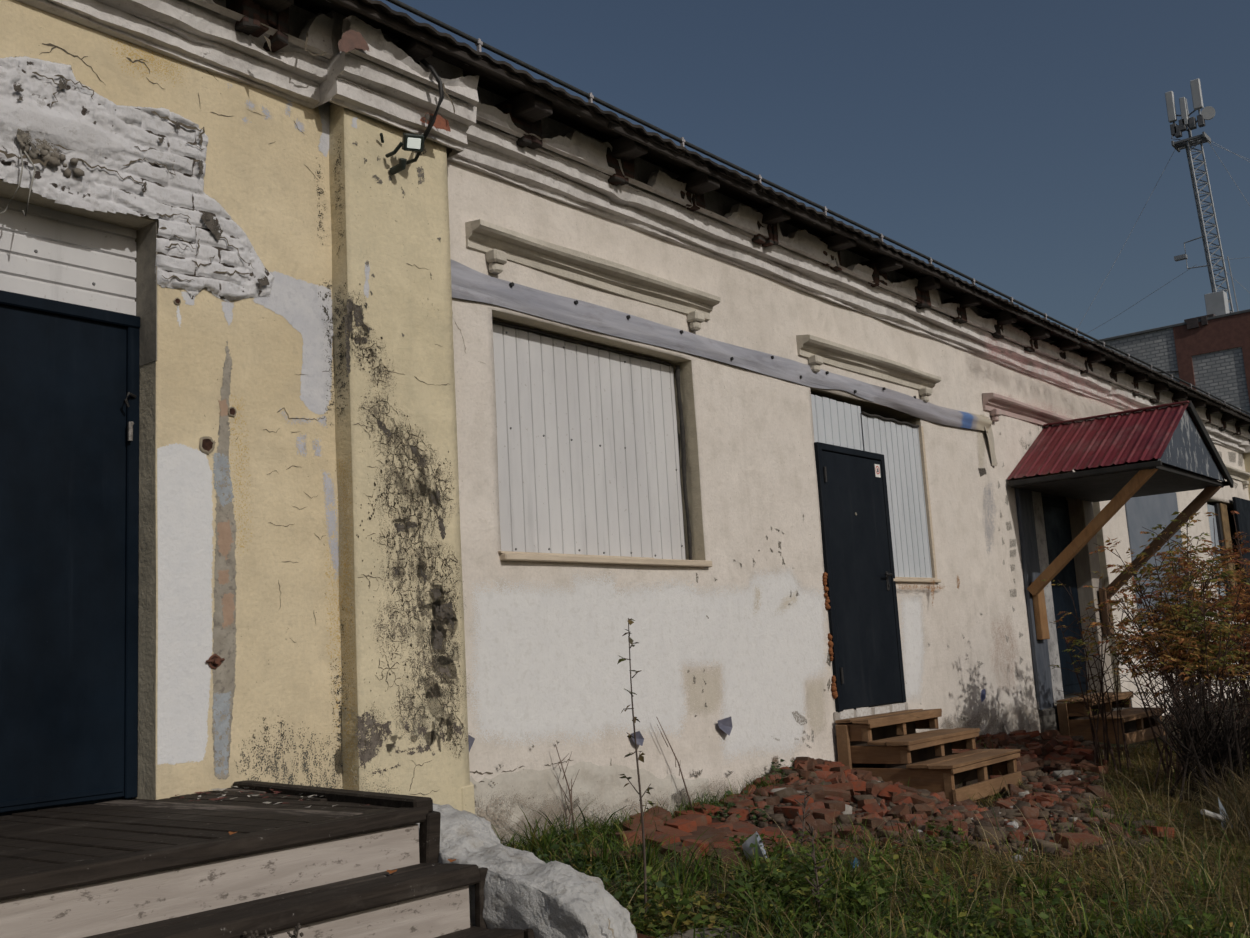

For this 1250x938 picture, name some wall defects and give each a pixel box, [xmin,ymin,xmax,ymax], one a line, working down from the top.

leakage [314,134,344,258]
spalling [0,56,339,580]
leakage [318,276,349,425]
peeling [157,436,235,776]
leakage [236,607,407,795]